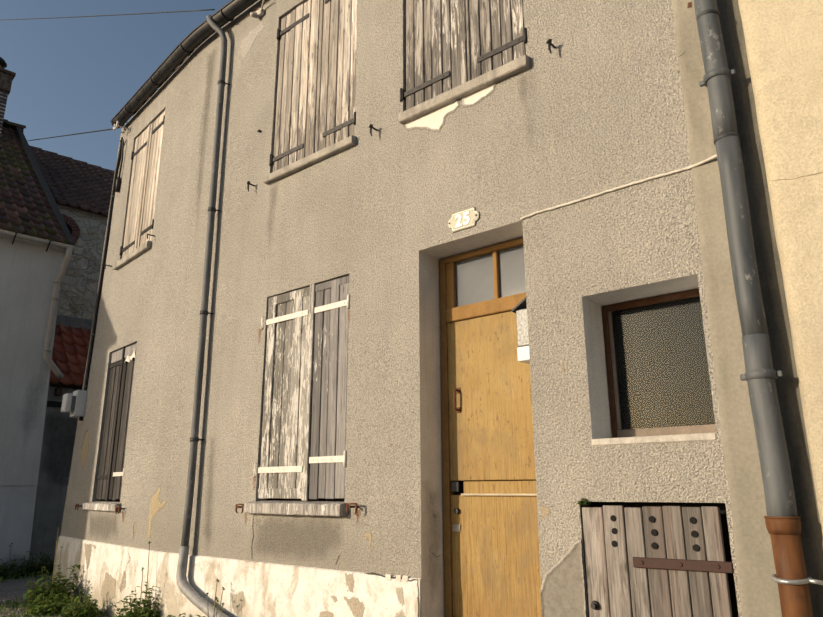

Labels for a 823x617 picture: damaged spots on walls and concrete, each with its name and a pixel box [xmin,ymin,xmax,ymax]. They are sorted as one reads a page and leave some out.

flaking render [404,83,496,132]
peeling [84,544,95,568]
peeling [101,571,126,603]
peeling [230,591,245,614]
peeling [332,573,364,617]